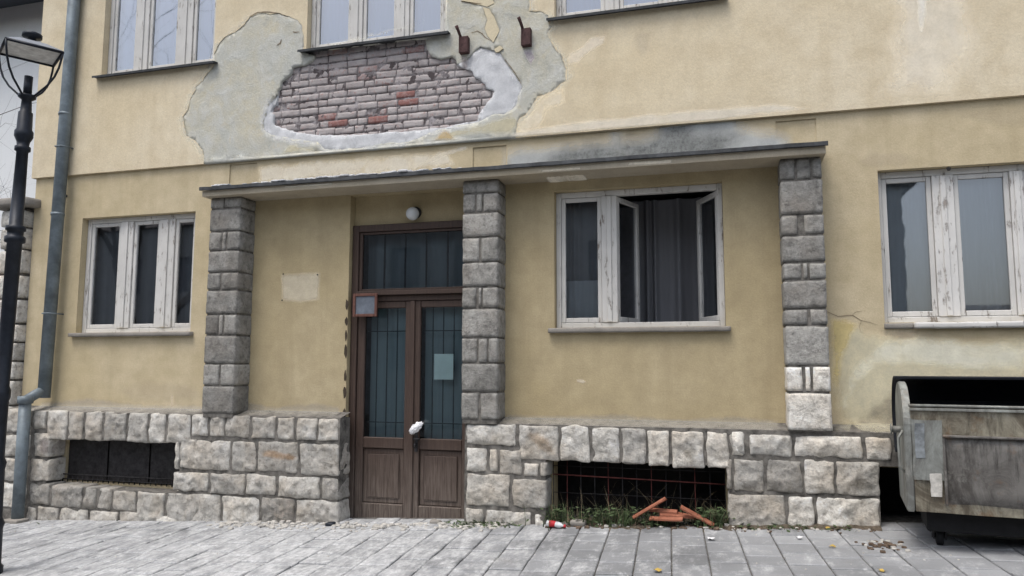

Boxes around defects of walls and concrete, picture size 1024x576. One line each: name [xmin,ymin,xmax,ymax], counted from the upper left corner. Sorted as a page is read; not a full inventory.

flaking render [180,0,603,182]
water stain [494,106,789,164]